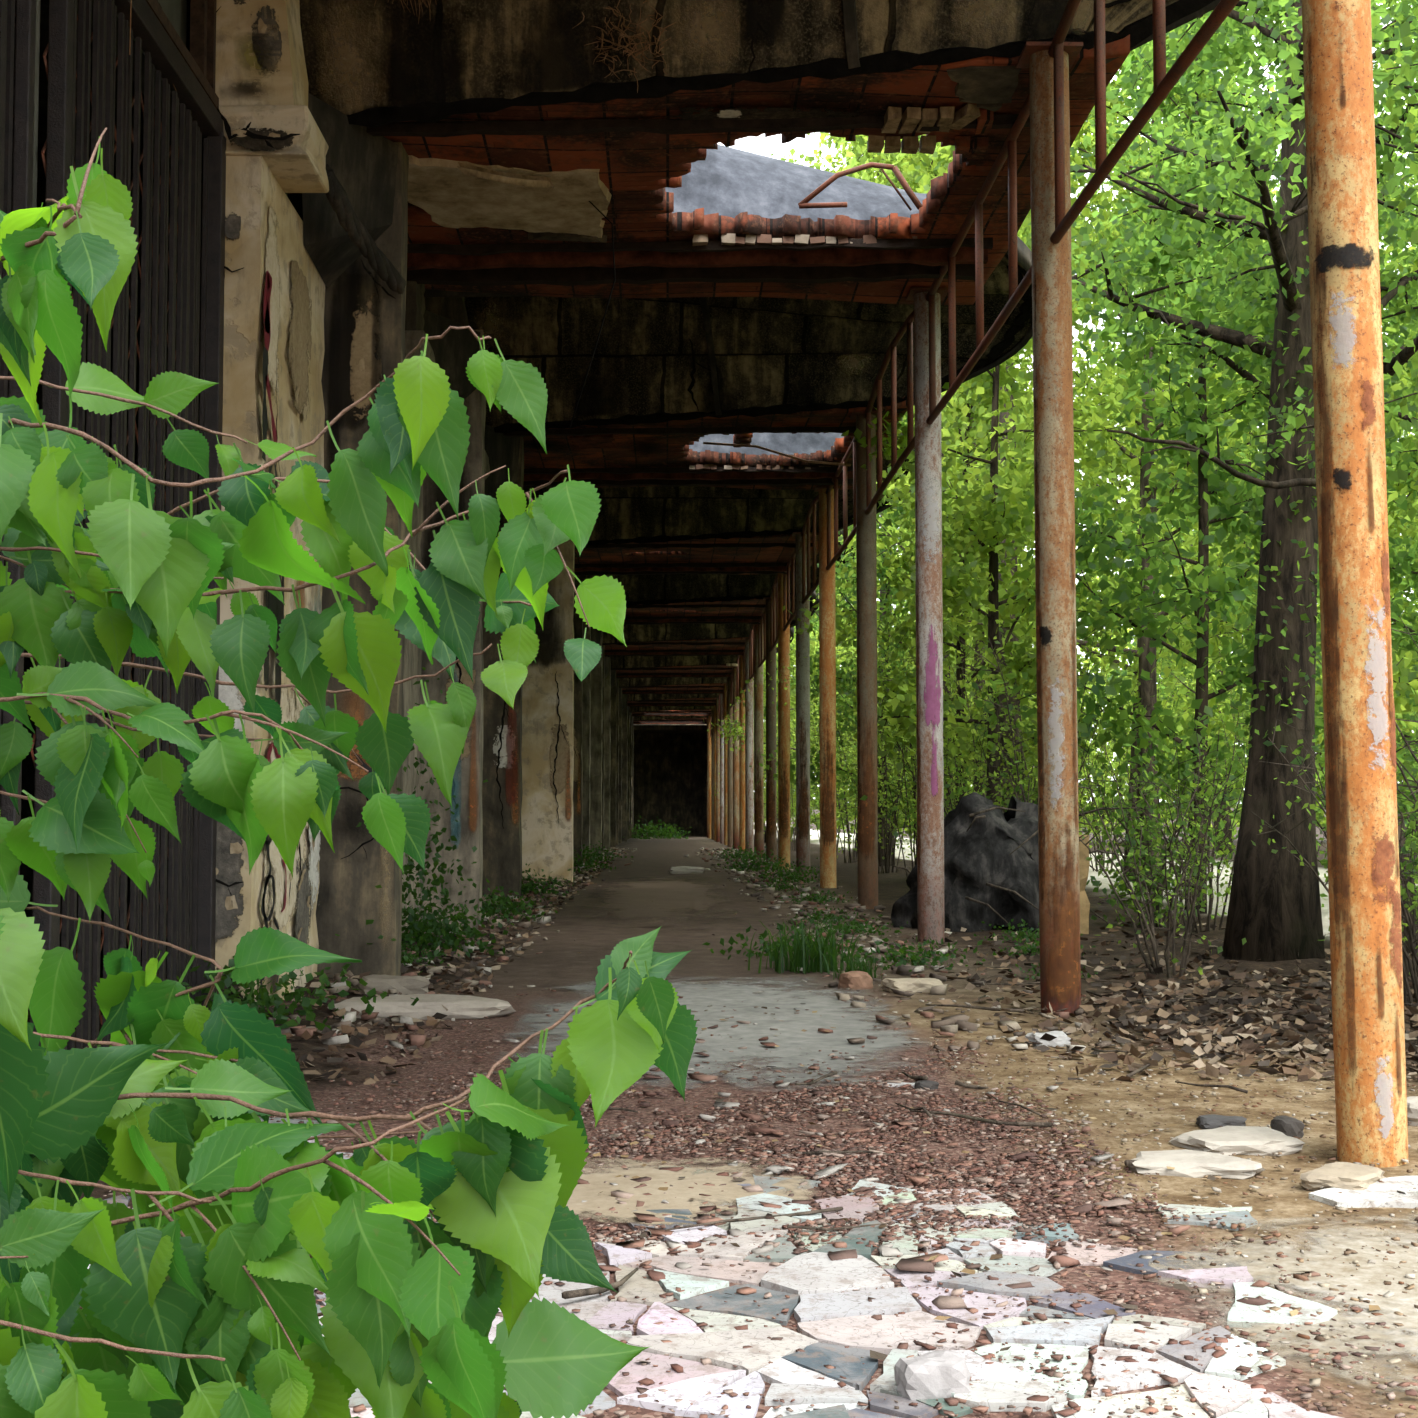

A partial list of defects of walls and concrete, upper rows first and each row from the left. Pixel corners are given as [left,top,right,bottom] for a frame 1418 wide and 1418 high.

water stain [233,83,262,96]
water stain [516,0,611,92]
water stain [687,0,784,58]
peeling [1329,291,1357,368]
corrosion [1361,380,1390,617]
corrosion [1035,465,1081,1003]
corrosion [1314,228,1356,1073]
peeling [1365,600,1391,770]
corrosion [1389,640,1397,772]
corrosion [1371,827,1403,1096]